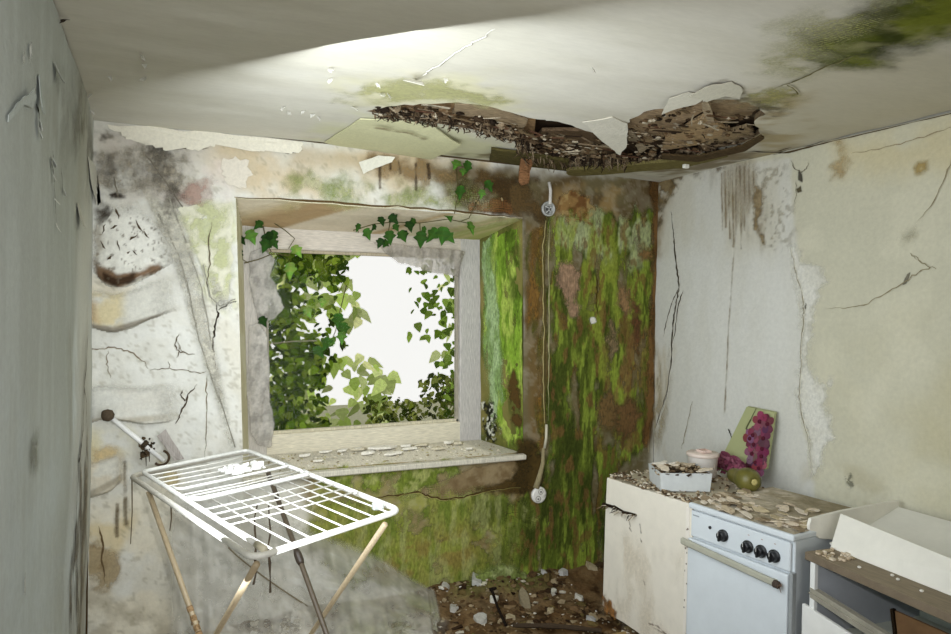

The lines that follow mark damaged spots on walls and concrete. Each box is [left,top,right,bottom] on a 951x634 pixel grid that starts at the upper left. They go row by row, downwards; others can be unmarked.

peeling [8,74,46,122]
damp [361,80,505,105]
peeling [88,157,101,205]
flaking render [324,107,461,174]
damp [721,169,764,244]
crack [750,113,951,202]
crack [802,254,936,316]
crack [648,211,684,452]
peeling [791,247,834,475]
crack [71,301,237,620]
damp [481,402,500,443]
damp [507,369,541,493]